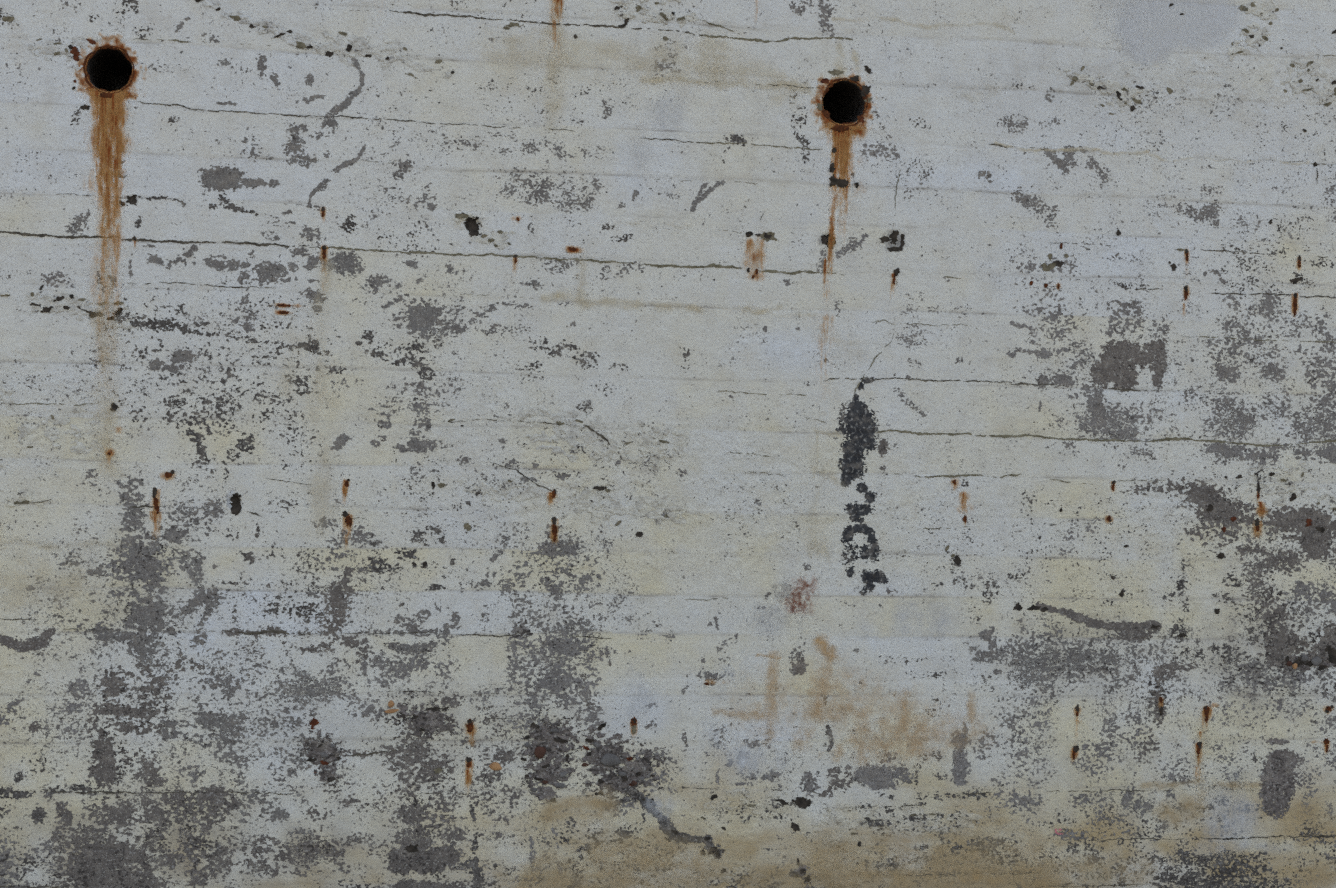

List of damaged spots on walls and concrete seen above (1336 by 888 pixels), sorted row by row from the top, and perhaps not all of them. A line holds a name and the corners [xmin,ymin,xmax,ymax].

corrosion [75,36,139,273]
corrosion [747,239,762,279]
corrosion [811,74,873,283]
corrosion [1196,704,1216,768]